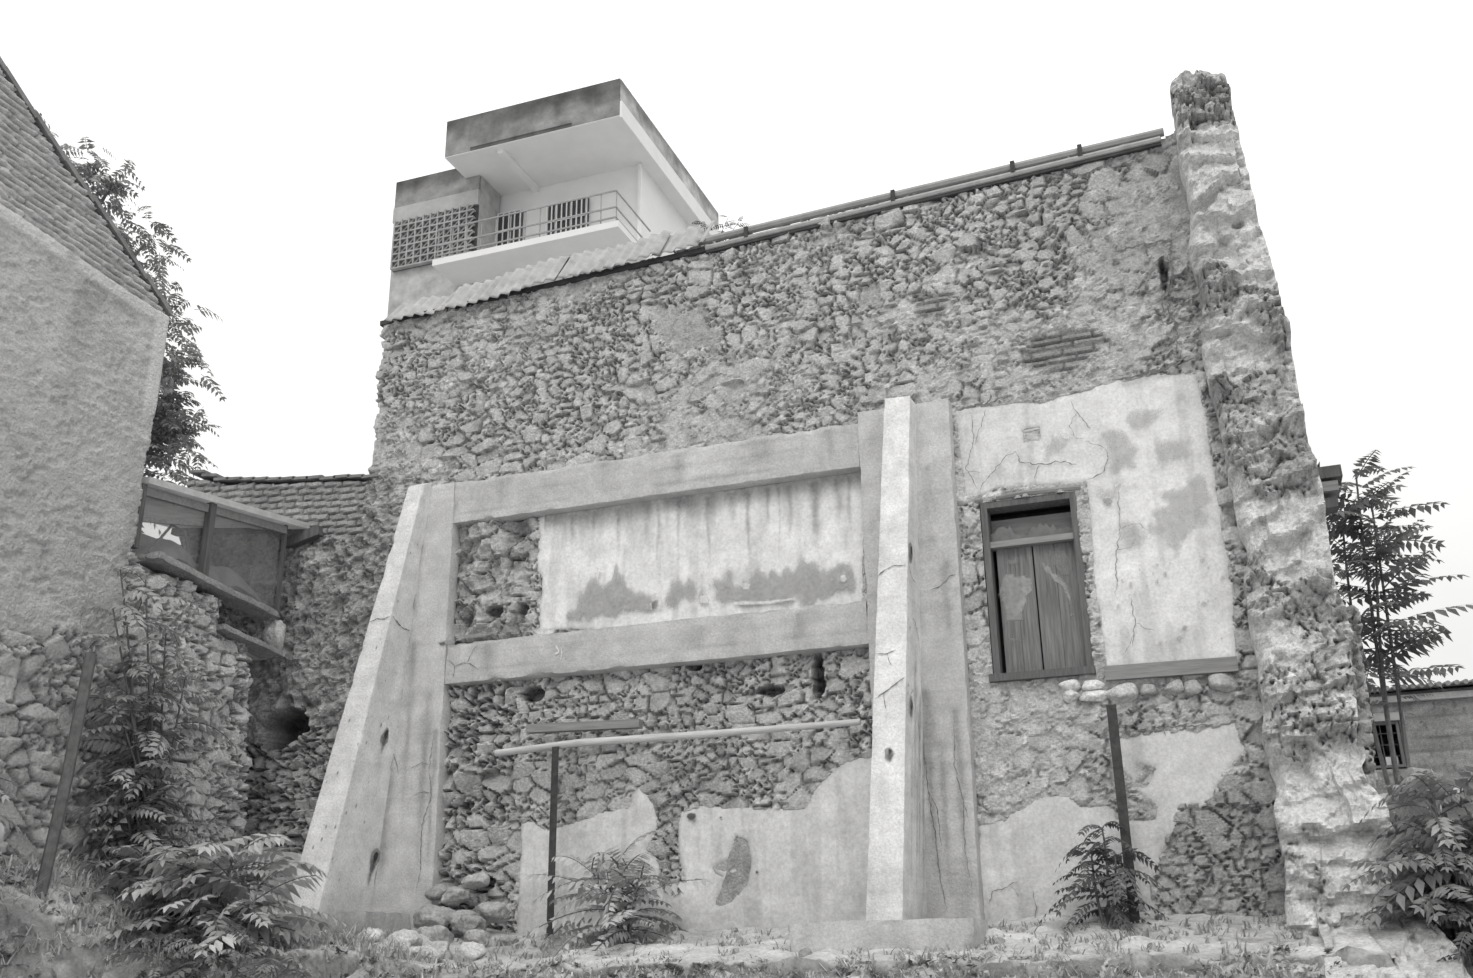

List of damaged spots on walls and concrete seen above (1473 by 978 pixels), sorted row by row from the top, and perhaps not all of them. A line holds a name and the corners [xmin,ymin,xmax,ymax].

crack [956,394,1153,653]
spalling [713,837,759,906]